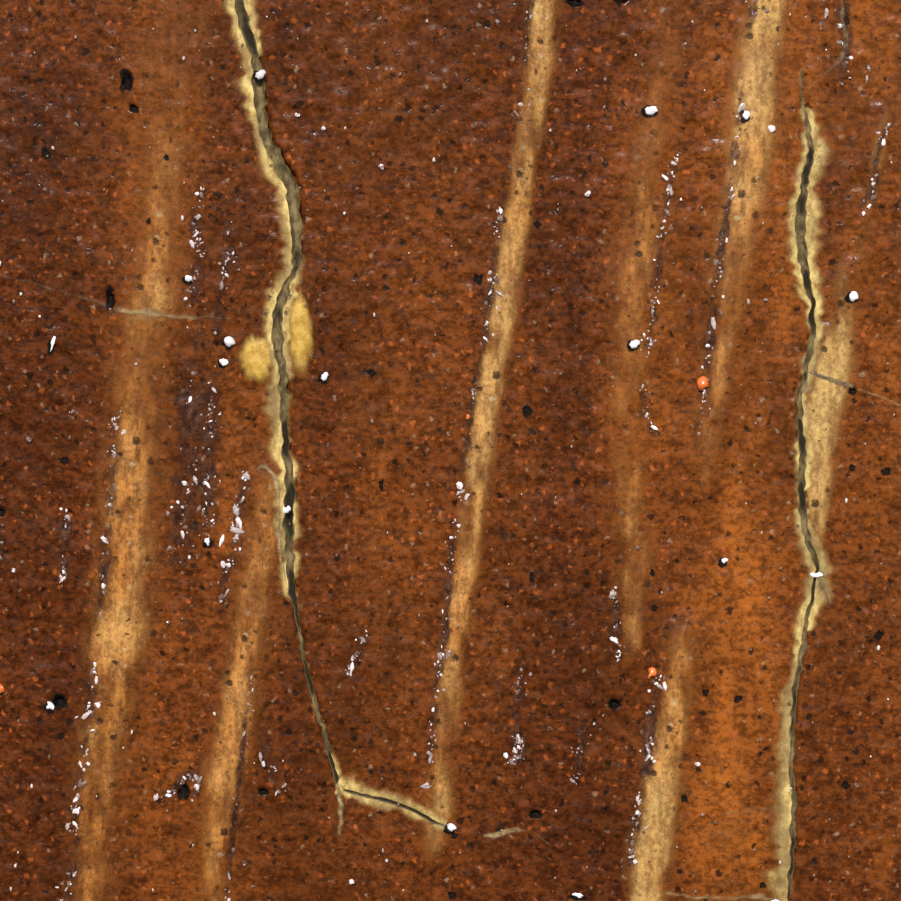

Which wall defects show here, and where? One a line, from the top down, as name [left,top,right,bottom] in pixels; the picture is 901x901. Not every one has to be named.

crack [224,0,448,832]
damp [428,0,554,848]
crack [486,829,517,838]
damp [631,638,691,901]
damp [712,0,787,409]
crack [732,68,853,901]